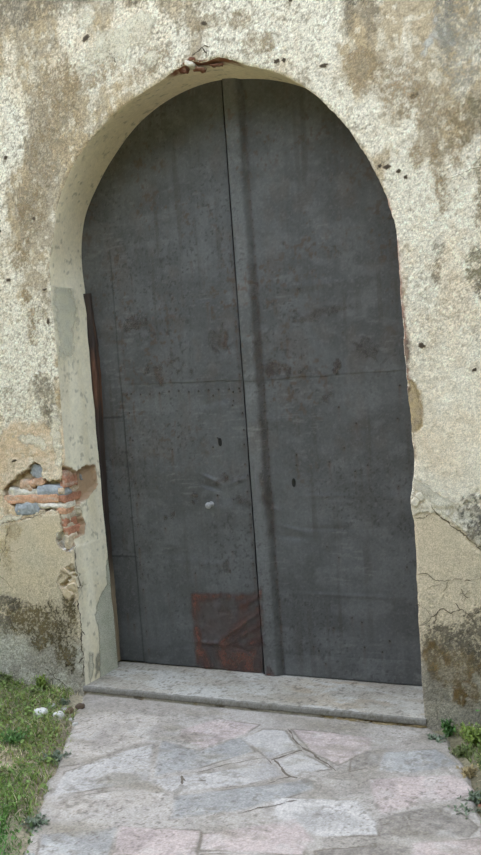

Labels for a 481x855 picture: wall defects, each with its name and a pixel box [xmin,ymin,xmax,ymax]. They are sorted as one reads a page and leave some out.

water stain [344,0,379,36]
water stain [347,46,481,211]
water stain [465,247,481,299]
water stain [21,290,45,345]
water stain [55,287,76,356]
crack [0,513,41,606]
spalling [0,417,83,551]
spalling [57,564,80,603]
peeling [413,480,481,548]
crack [415,573,481,633]
crack [417,505,481,551]
water stain [421,607,481,675]